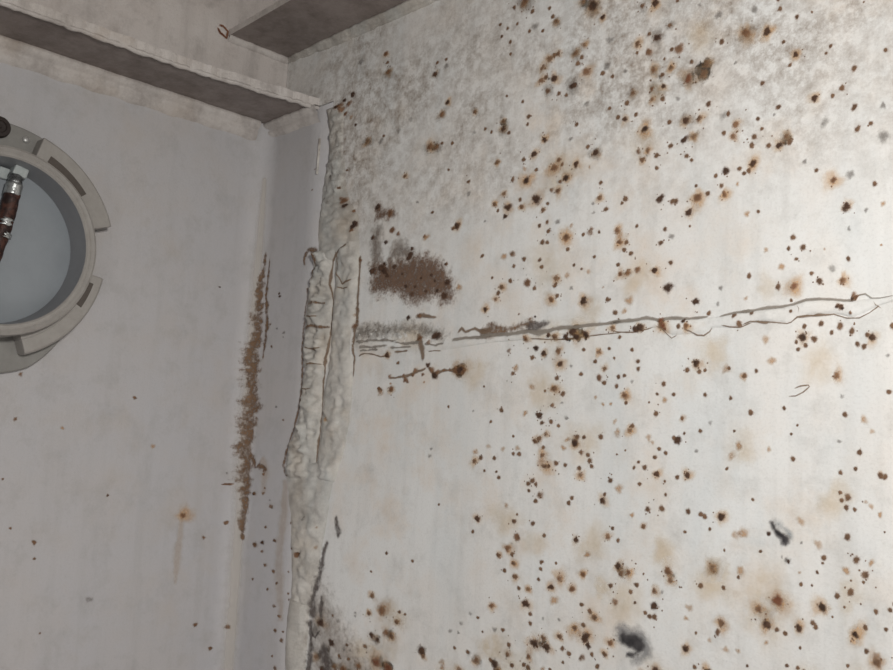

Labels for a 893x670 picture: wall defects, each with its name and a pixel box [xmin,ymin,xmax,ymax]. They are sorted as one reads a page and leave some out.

rust [722,117,773,148]
rust [337,186,358,232]
rust [370,203,460,306]
crack [282,244,407,476]
rust [377,332,467,394]
rust [458,313,565,360]
crack [429,293,893,352]
rust [789,295,870,351]
rust [221,255,281,552]
rust [524,437,594,503]
rust [633,447,689,529]
rust [834,553,877,609]